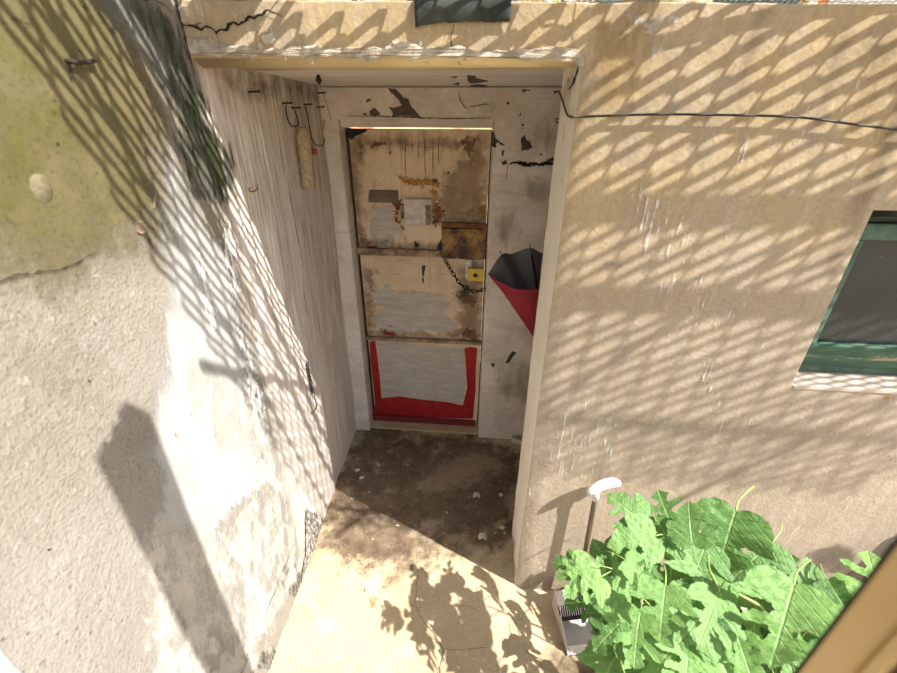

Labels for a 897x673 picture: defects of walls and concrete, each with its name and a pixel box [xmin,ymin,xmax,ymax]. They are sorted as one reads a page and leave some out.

crack [145,0,282,69]
peeling [451,75,488,87]
peeling [388,88,420,117]
damp [203,129,225,190]
peeling [347,128,368,139]
corrosion [457,136,478,166]
peeling [489,132,507,165]
corrosion [398,137,445,226]
crack [0,251,102,282]
peeling [140,322,310,673]
crack [407,555,486,673]